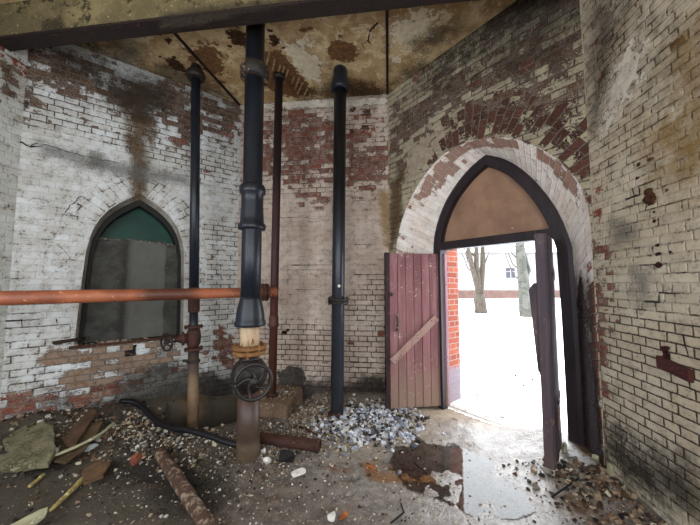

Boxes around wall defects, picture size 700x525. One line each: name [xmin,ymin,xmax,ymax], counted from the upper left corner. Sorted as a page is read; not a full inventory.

peeling [158,27,246,83]
crack [20,141,116,163]
peeling [0,47,191,159]
leakage [101,74,166,198]
peeling [200,92,244,151]
peeling [263,26,360,211]
peeling [346,0,592,213]
peeling [0,333,181,421]
peeling [202,325,235,375]